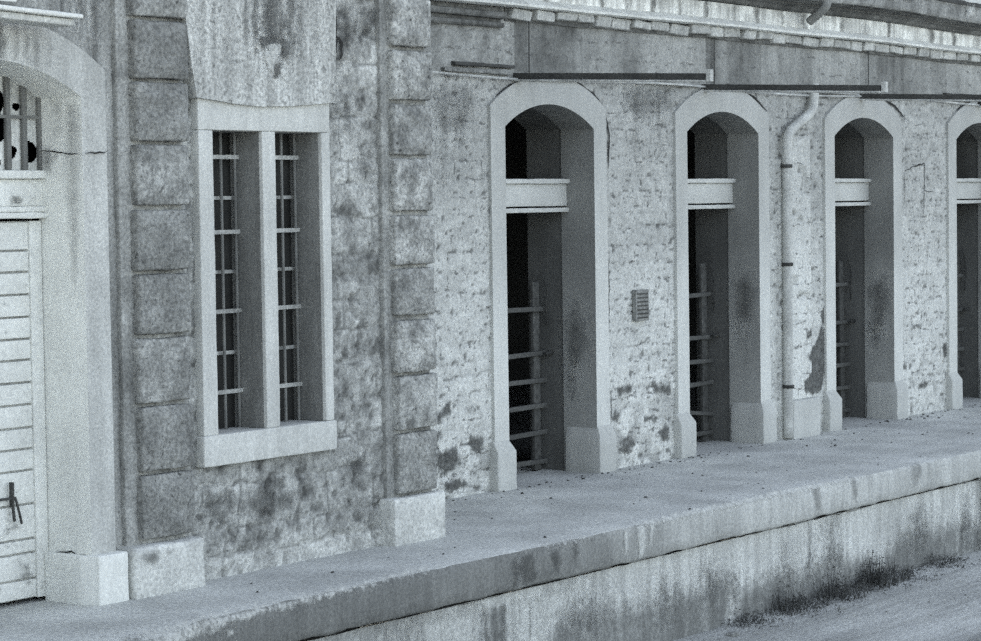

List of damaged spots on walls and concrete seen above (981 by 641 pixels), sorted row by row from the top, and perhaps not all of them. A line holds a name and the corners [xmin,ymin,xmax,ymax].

water stain [245,0,295,44]
water stain [887,521,980,574]
water stain [410,580,727,641]